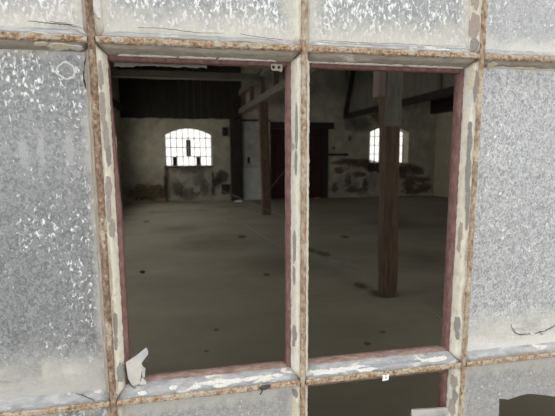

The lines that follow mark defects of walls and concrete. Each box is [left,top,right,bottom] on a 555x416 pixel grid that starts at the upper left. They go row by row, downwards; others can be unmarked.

peeling [457,121,473,252]
peeling [309,365,378,375]
peeling [191,373,283,389]